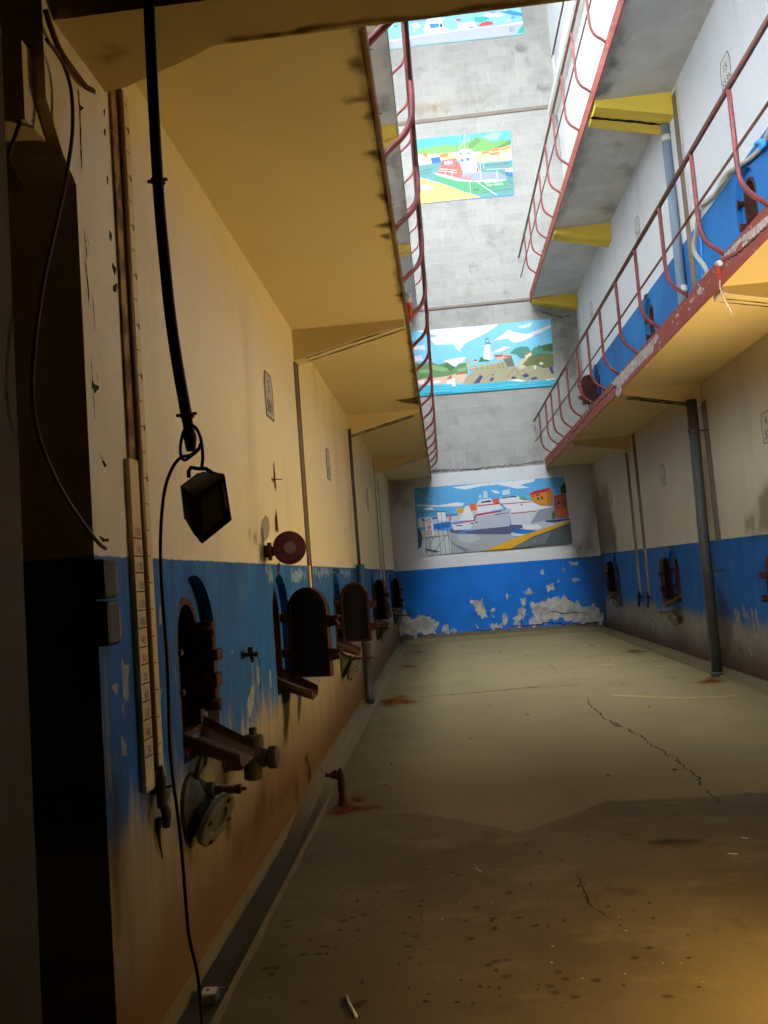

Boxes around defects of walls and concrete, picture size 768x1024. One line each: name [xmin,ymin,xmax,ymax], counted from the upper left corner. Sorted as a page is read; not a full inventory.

peeling [399,602,457,638]
peeling [470,561,604,630]
crack [395,661,722,803]